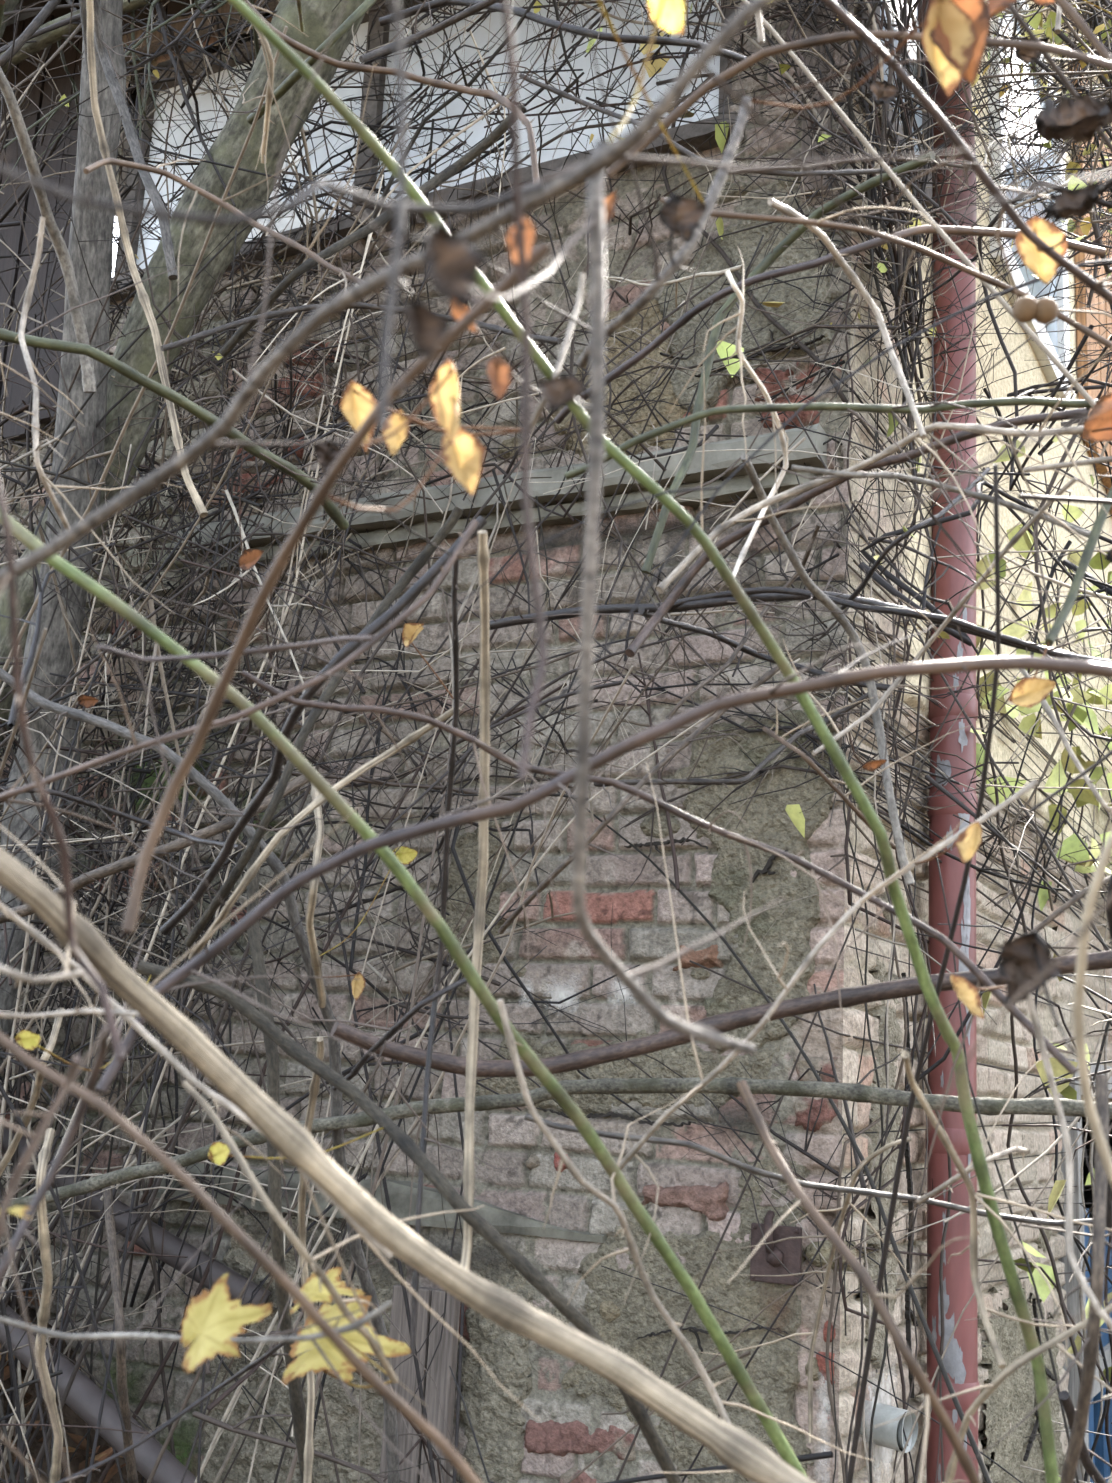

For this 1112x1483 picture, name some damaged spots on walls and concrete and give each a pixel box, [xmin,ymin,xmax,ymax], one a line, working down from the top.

flaking render [475,710,838,1132]
flaking render [471,1233,534,1306]
spalling [525,1152,571,1172]
flaking render [460,1307,750,1483]
flaking render [575,1156,836,1473]
flaking render [854,957,903,1373]